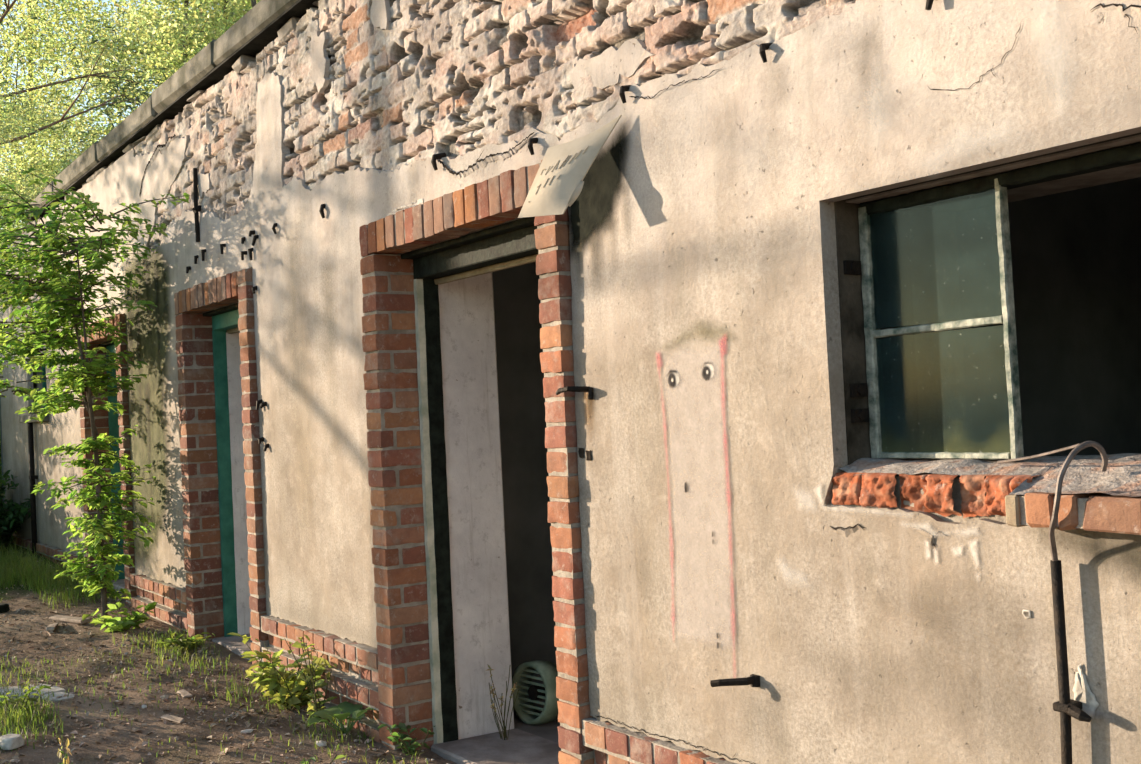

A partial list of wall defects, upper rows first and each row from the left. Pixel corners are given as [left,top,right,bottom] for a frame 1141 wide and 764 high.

crack [1091,3,1141,34]
crack [930,24,1021,91]
crack [629,67,723,99]
flaking render [134,0,858,260]
crack [439,132,535,179]